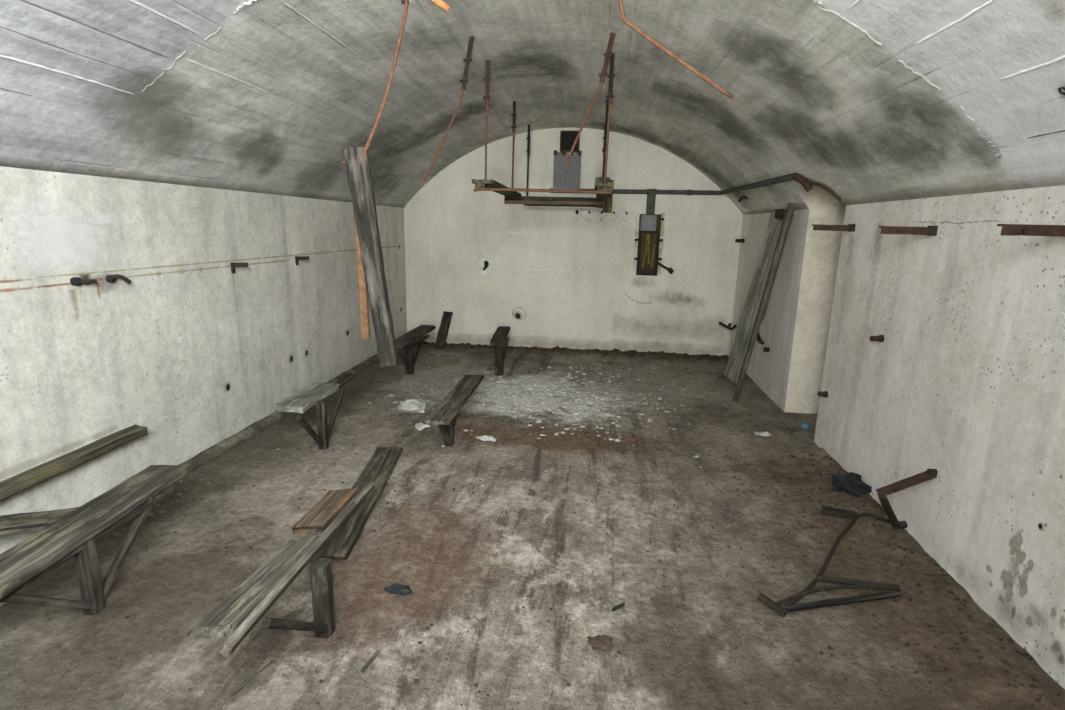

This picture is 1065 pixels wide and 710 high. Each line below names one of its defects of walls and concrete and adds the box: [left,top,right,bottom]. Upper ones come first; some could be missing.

crack [0,26,69,51]
crack [21,0,259,92]
crack [813,0,941,90]
leakage [101,74,190,150]
crack [960,105,1001,159]
corrosion [0,250,350,296]